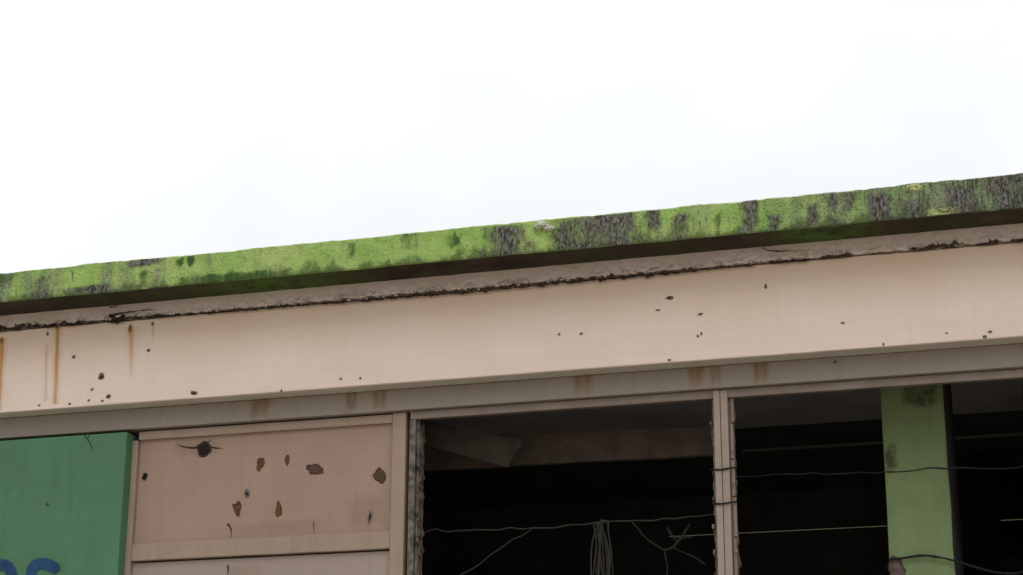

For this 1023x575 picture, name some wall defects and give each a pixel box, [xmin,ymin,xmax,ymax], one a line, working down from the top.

mould [483,225,531,255]
mould [554,210,688,249]
mould [741,199,779,233]
mould [829,192,854,210]
mould [869,193,919,220]
mould [985,173,1023,209]
mould [128,258,158,268]
leakage [64,283,110,294]
peeling [306,464,324,475]
peeling [372,466,387,484]
peeling [232,488,250,516]
spalling [888,555,906,575]